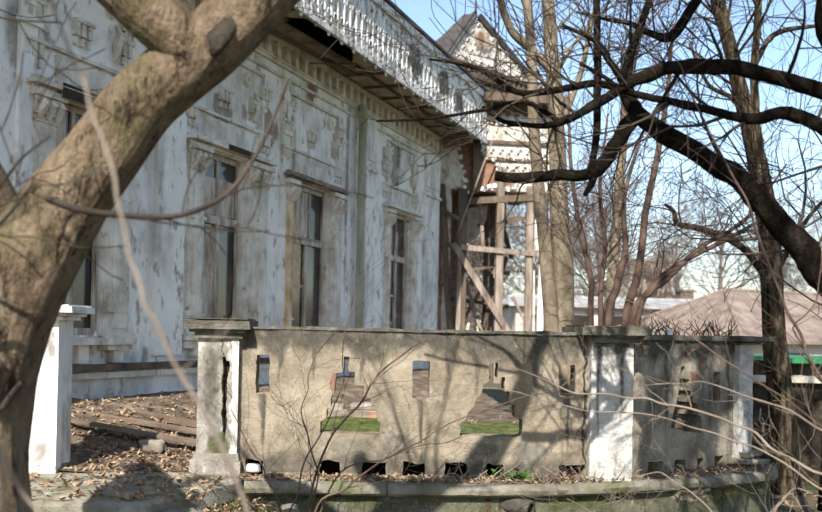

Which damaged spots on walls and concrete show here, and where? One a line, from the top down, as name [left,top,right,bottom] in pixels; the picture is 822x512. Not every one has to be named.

spalling [456,144,518,194]
crack [221,339,232,439]